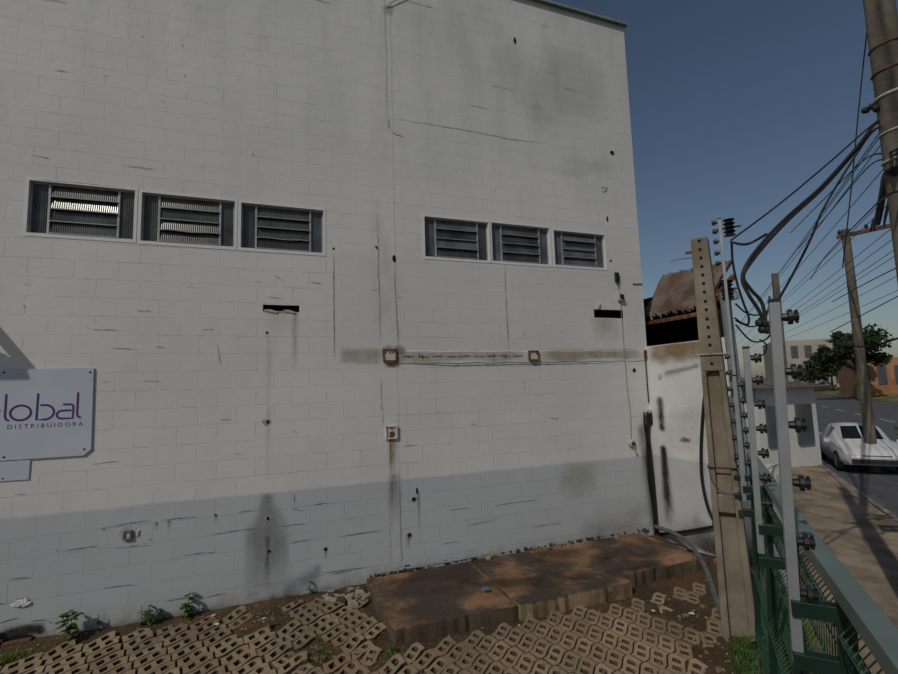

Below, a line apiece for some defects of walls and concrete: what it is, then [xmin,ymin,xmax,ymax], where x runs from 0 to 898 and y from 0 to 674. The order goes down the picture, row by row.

rust [551,351,628,360]